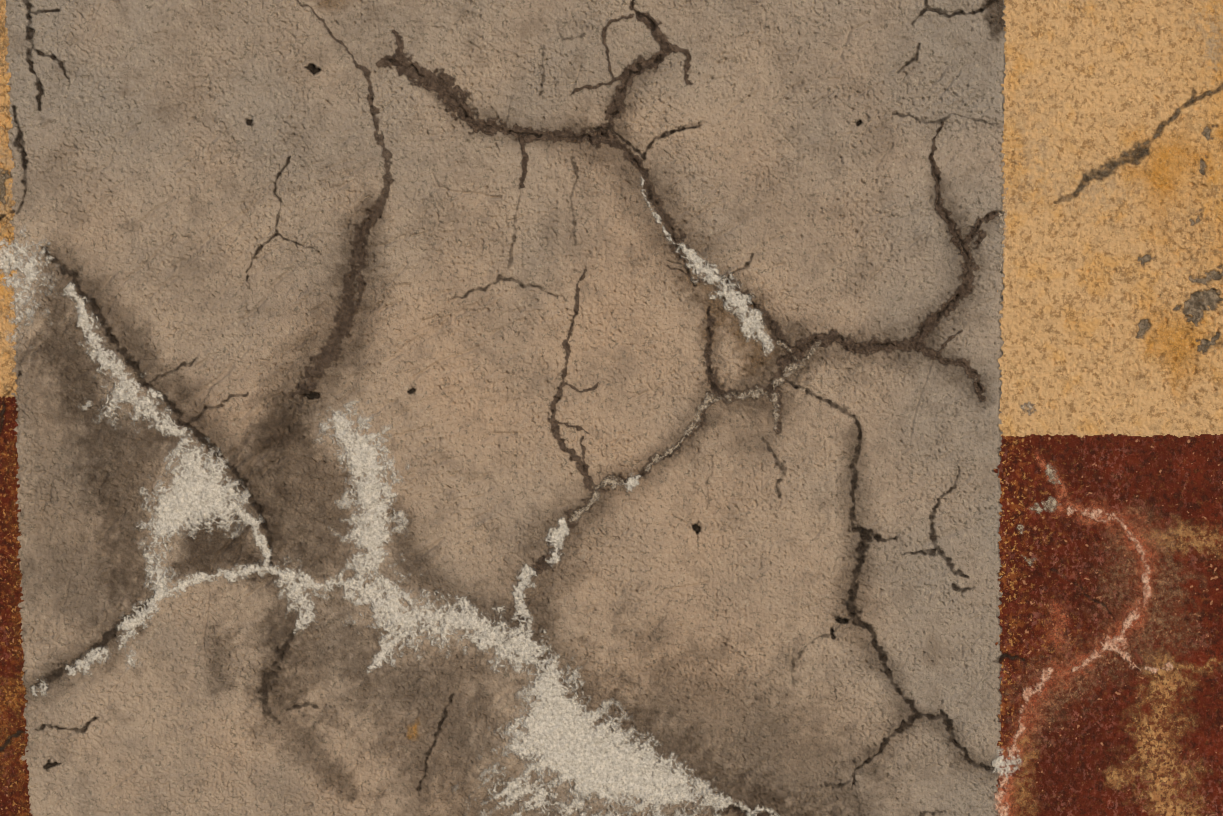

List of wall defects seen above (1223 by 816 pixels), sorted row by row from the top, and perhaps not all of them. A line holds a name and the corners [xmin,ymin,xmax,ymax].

crack [0,0,69,221]
crack [1054,84,1223,204]
crack [246,156,319,289]
peeling [1136,319,1151,338]
peeling [1173,265,1223,353]
crack [41,247,272,567]
crack [289,0,1005,791]
leakage [0,179,819,816]
crack [0,717,97,752]
crack [30,598,151,694]
crack [260,628,318,723]
crack [704,799,780,816]